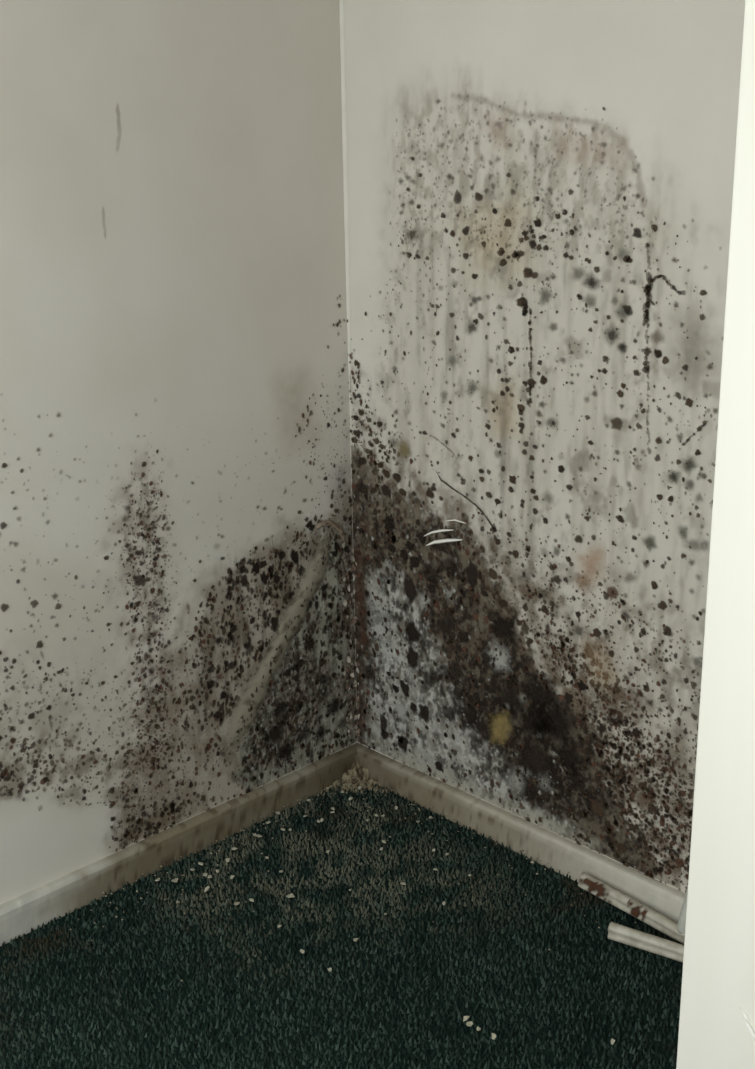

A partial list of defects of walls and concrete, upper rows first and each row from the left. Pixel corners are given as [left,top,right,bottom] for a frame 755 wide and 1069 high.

water stain [0,175,717,893]
rust [579,878,610,903]
rust [627,900,647,920]